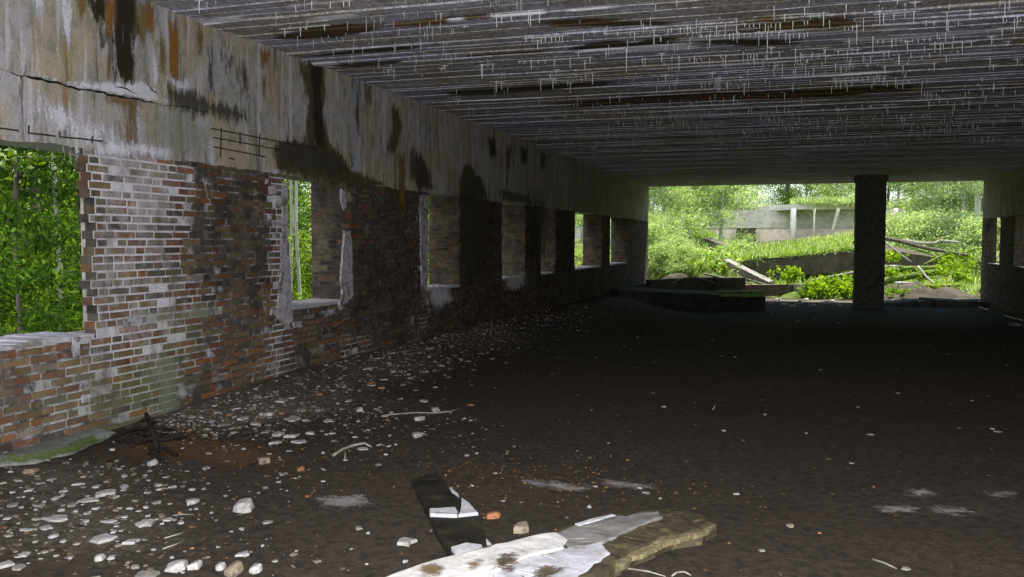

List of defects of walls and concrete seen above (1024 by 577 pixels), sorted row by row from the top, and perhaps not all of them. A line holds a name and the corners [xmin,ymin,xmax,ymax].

water stain [56,0,72,43]
rust [106,0,117,37]
water stain [88,0,141,85]
rust [133,0,179,84]
water stain [197,15,244,26]
spalling [0,125,103,143]
crack [11,68,213,114]
water stain [152,48,248,126]
spalling [211,128,316,160]
water stain [272,59,382,188]
water stain [387,103,433,215]
water stain [454,163,550,284]